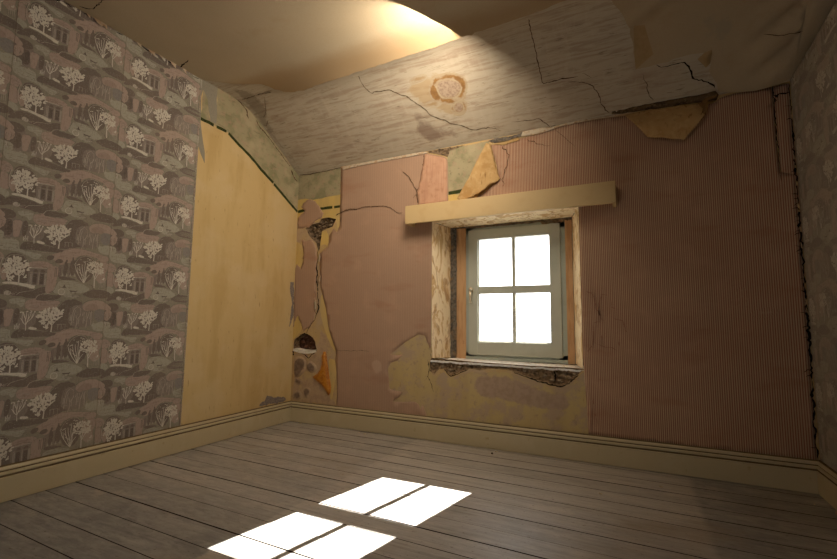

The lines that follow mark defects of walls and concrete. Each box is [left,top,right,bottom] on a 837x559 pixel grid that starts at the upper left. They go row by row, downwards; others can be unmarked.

leakage [403,68,473,148]
crack [529,20,608,112]
peeling [612,91,719,140]
crack [643,62,715,99]
peeling [417,146,462,205]
peeling [457,132,522,200]
spalling [306,217,336,251]
crack [788,86,819,458]
spalling [427,358,584,389]